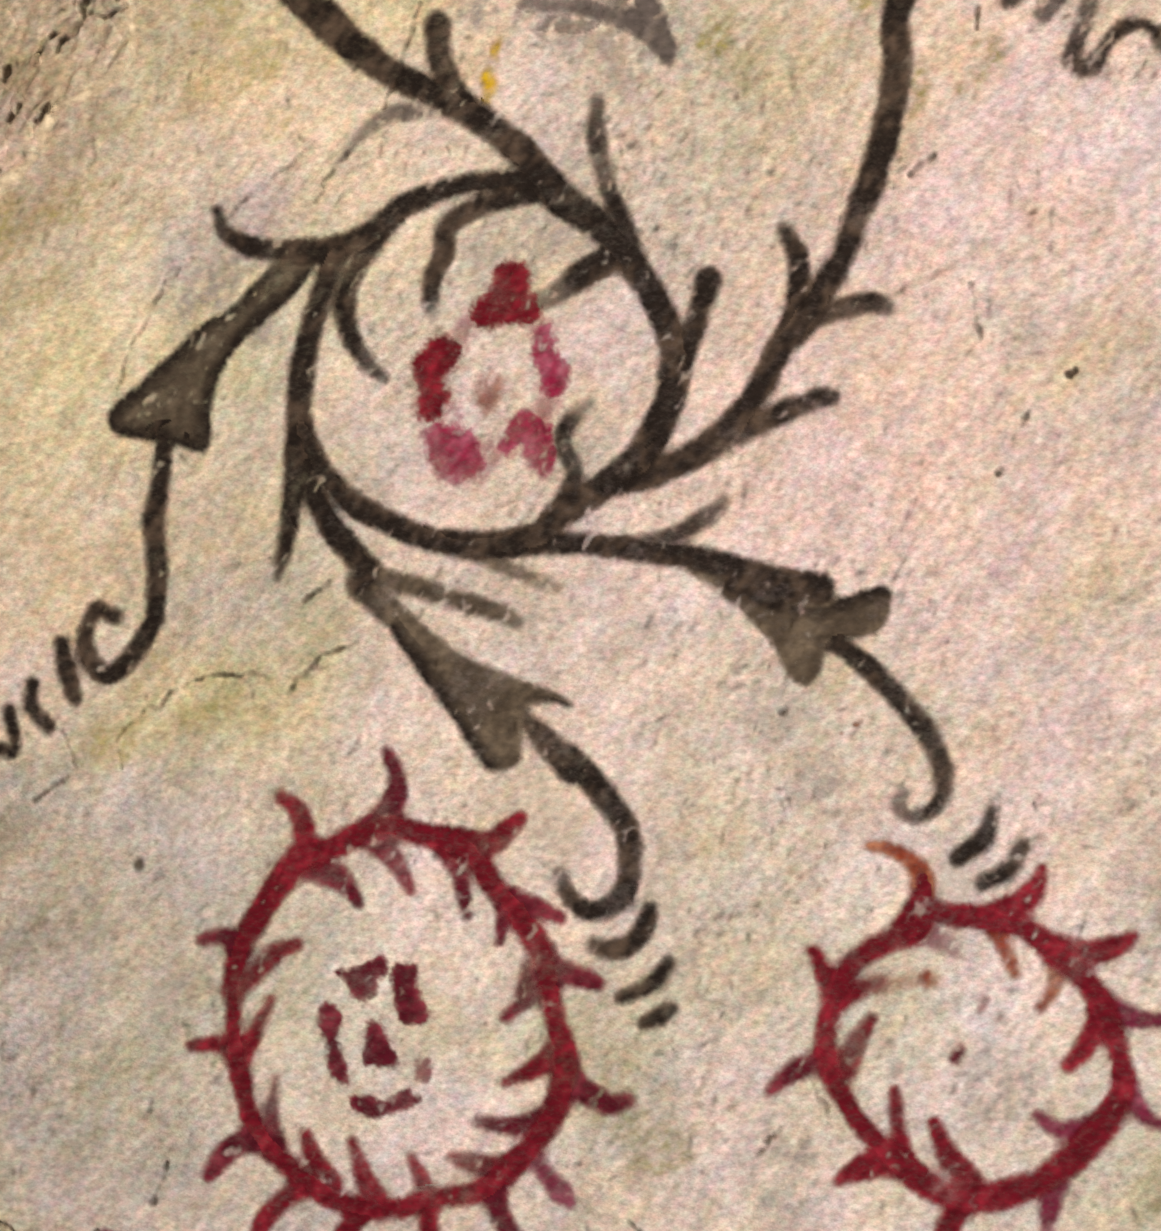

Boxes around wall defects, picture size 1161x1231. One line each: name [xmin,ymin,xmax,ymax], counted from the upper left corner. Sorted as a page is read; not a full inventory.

flaking render [0,0,141,194]